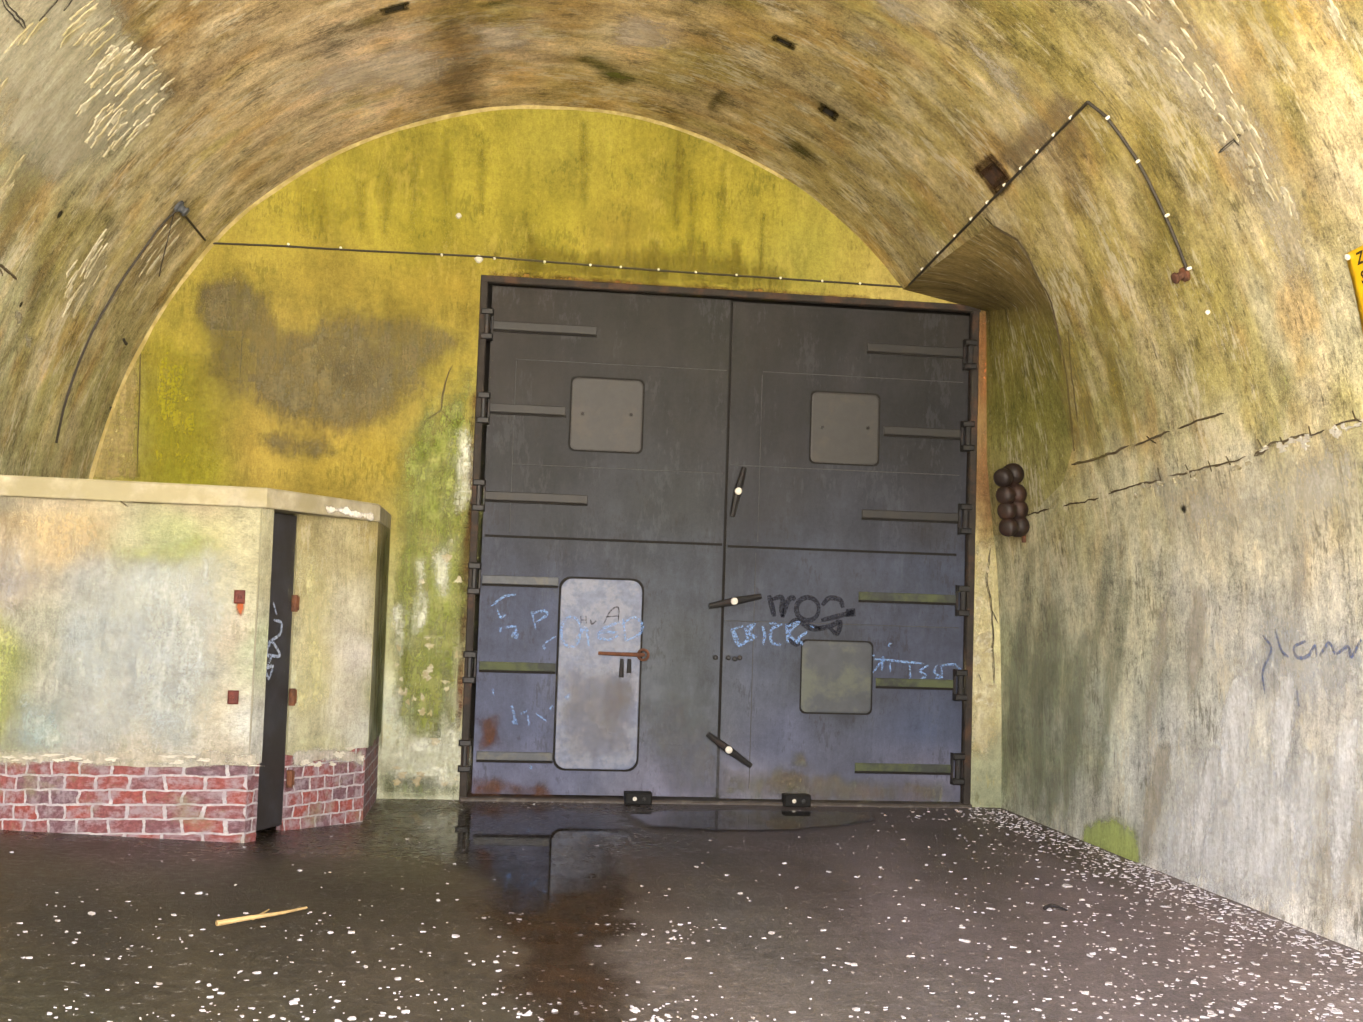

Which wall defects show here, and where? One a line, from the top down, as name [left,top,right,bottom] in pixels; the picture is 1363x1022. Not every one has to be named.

crack [2,0,73,28]
damp [198,277,455,428]
crack [985,218,1363,516]
damp [442,406,464,631]
corrosion [482,719,495,746]